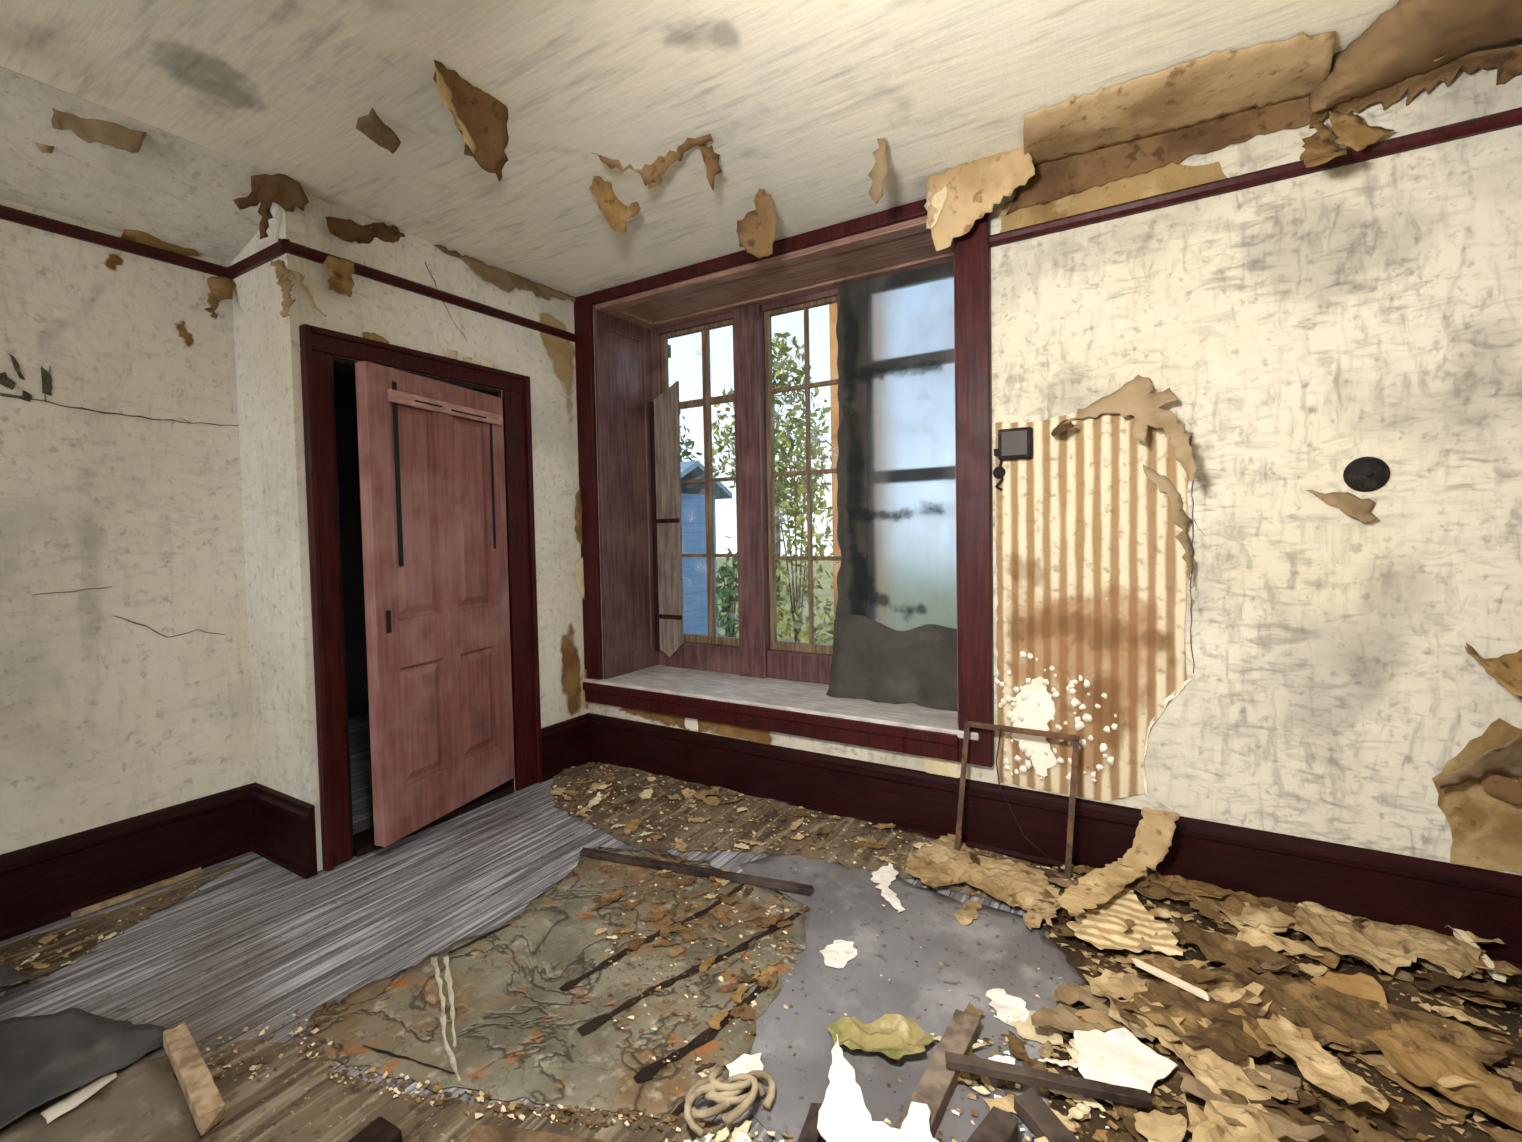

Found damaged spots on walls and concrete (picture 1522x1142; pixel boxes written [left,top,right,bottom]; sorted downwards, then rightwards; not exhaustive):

flaking render [1000,162,1227,233]
flaking render [994,412,1189,802]
flaking render [1432,718,1522,874]